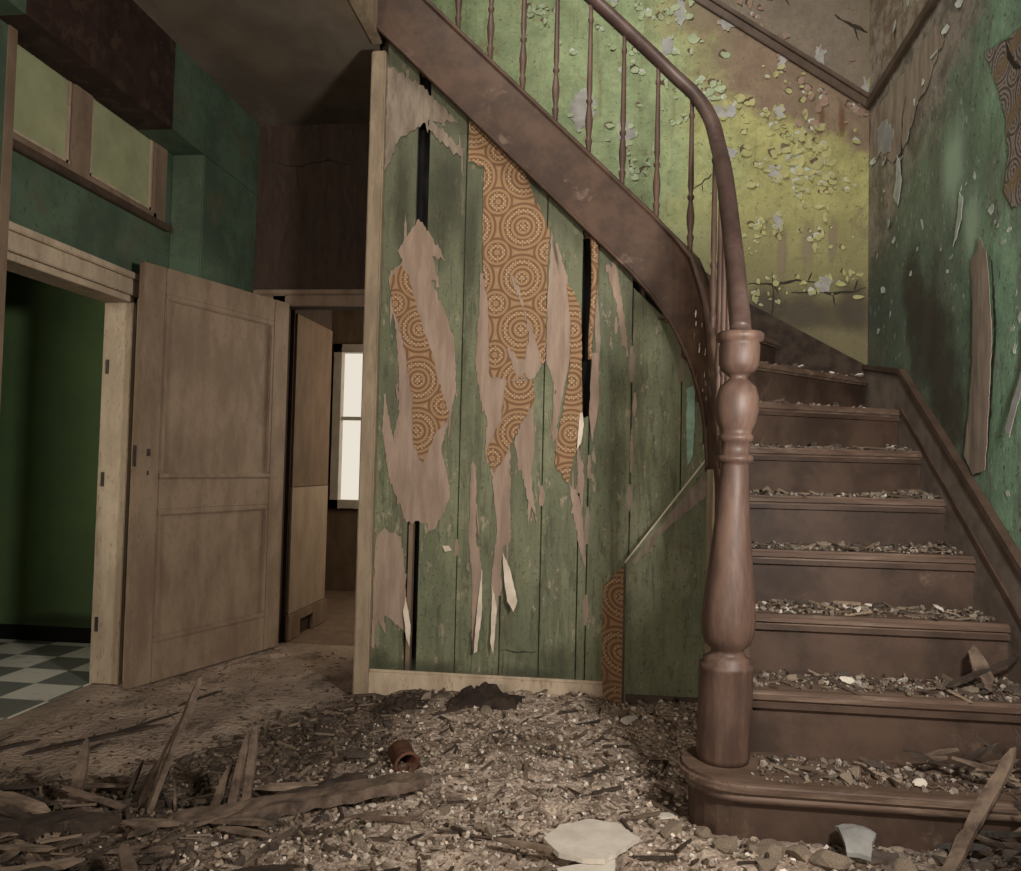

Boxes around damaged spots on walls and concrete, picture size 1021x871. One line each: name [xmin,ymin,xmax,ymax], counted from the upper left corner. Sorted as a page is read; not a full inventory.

peeling [634,0,704,58]
spalling [717,19,735,31]
peeling [618,47,646,76]
spalling [815,43,827,65]
spalling [567,88,597,132]
peeling [603,119,654,180]
peeling [694,54,857,254]
peeling [746,273,788,306]
peeling [794,268,864,295]
peeling [964,237,996,475]
peeling [1005,289,1021,438]